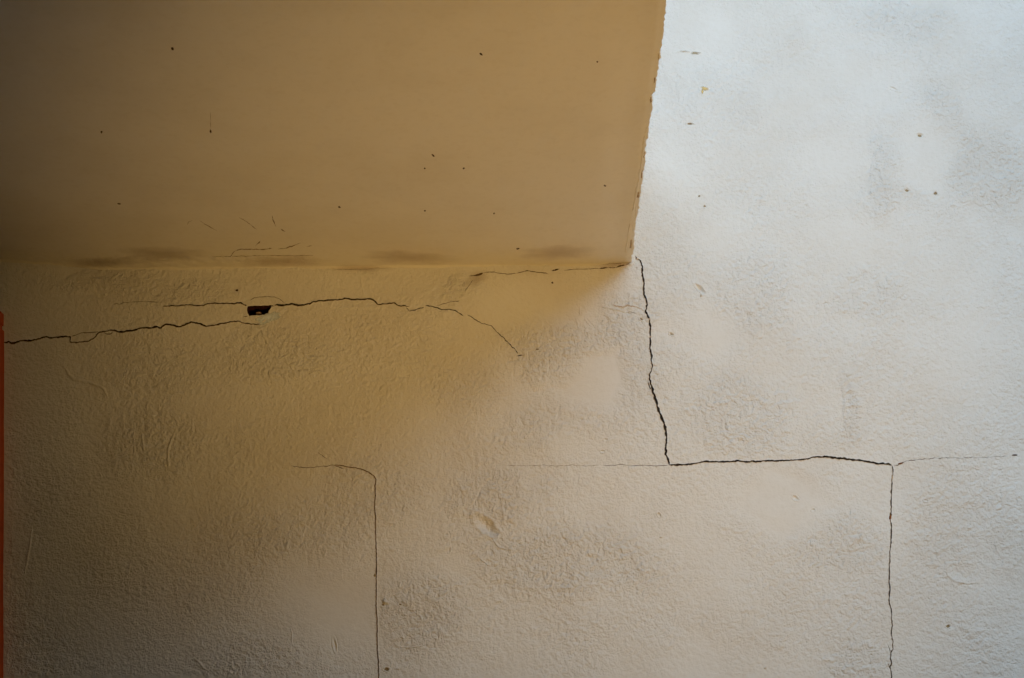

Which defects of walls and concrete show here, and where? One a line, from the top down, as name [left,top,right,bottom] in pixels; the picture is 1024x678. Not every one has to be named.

spalling [245,304,280,325]
crack [4,256,1000,678]